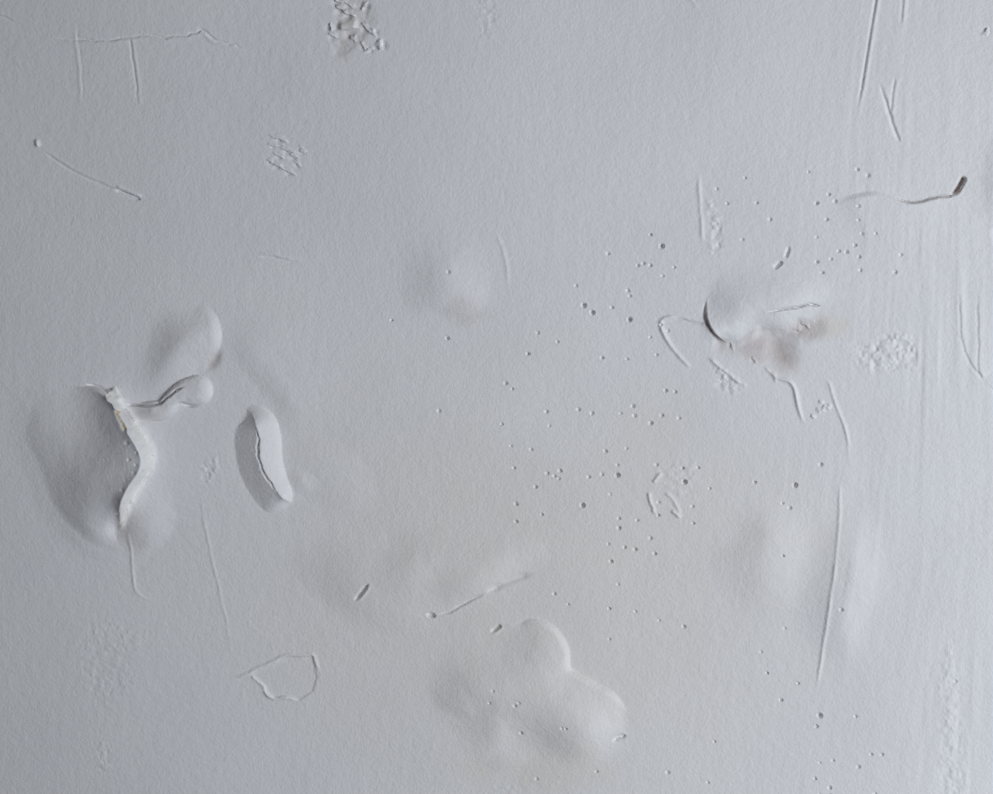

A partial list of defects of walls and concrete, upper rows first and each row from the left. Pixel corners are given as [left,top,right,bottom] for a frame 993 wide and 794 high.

crack [51,18,250,113]
peeling [329,0,382,59]
crack [887,172,968,205]
crack [958,285,993,394]